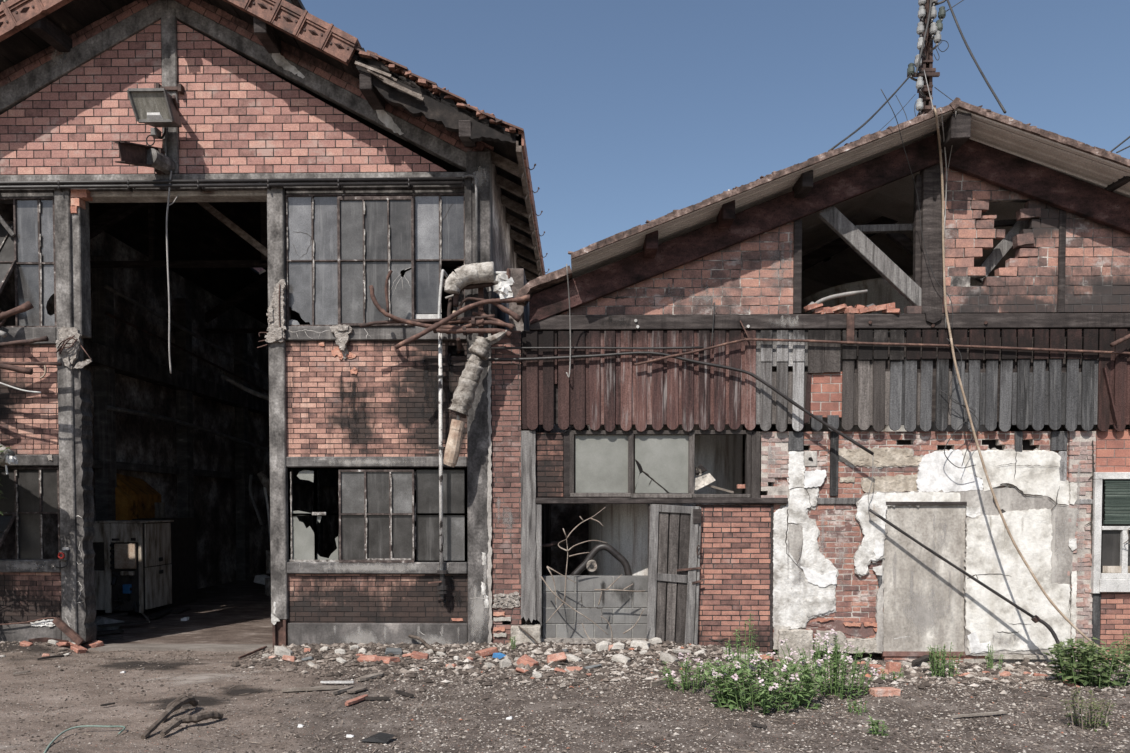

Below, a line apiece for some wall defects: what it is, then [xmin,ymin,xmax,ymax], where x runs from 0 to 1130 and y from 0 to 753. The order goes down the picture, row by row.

peeling [772,446,1078,655]